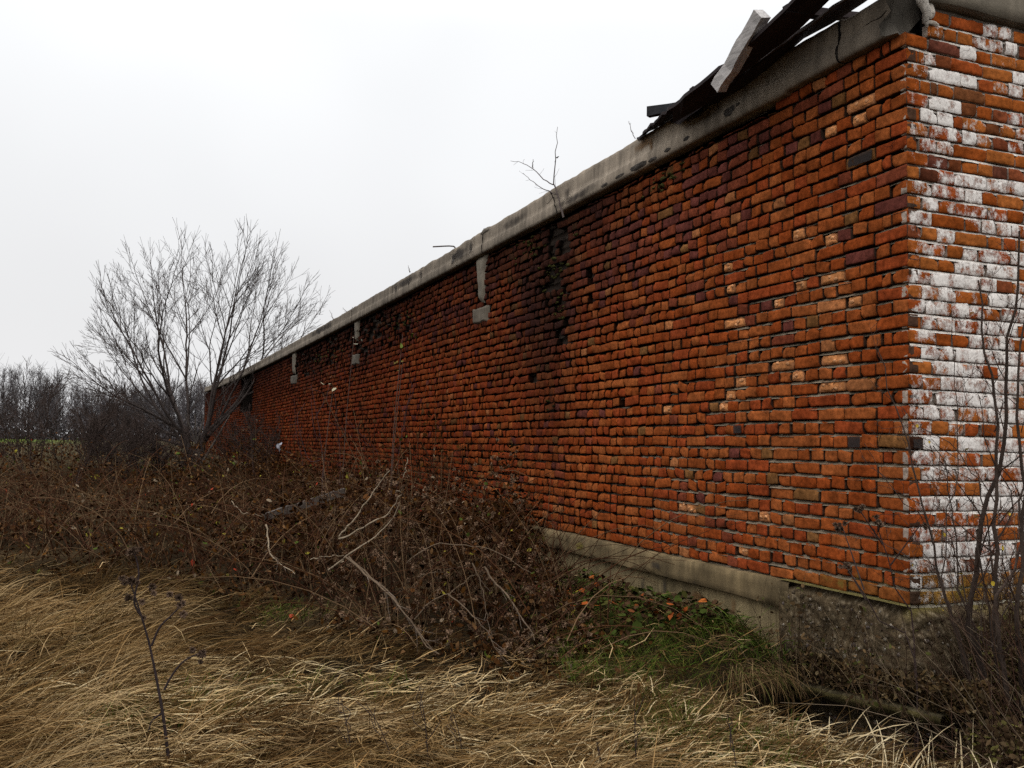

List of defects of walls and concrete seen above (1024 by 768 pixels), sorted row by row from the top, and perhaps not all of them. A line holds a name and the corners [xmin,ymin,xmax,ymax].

crack [835,11,886,63]